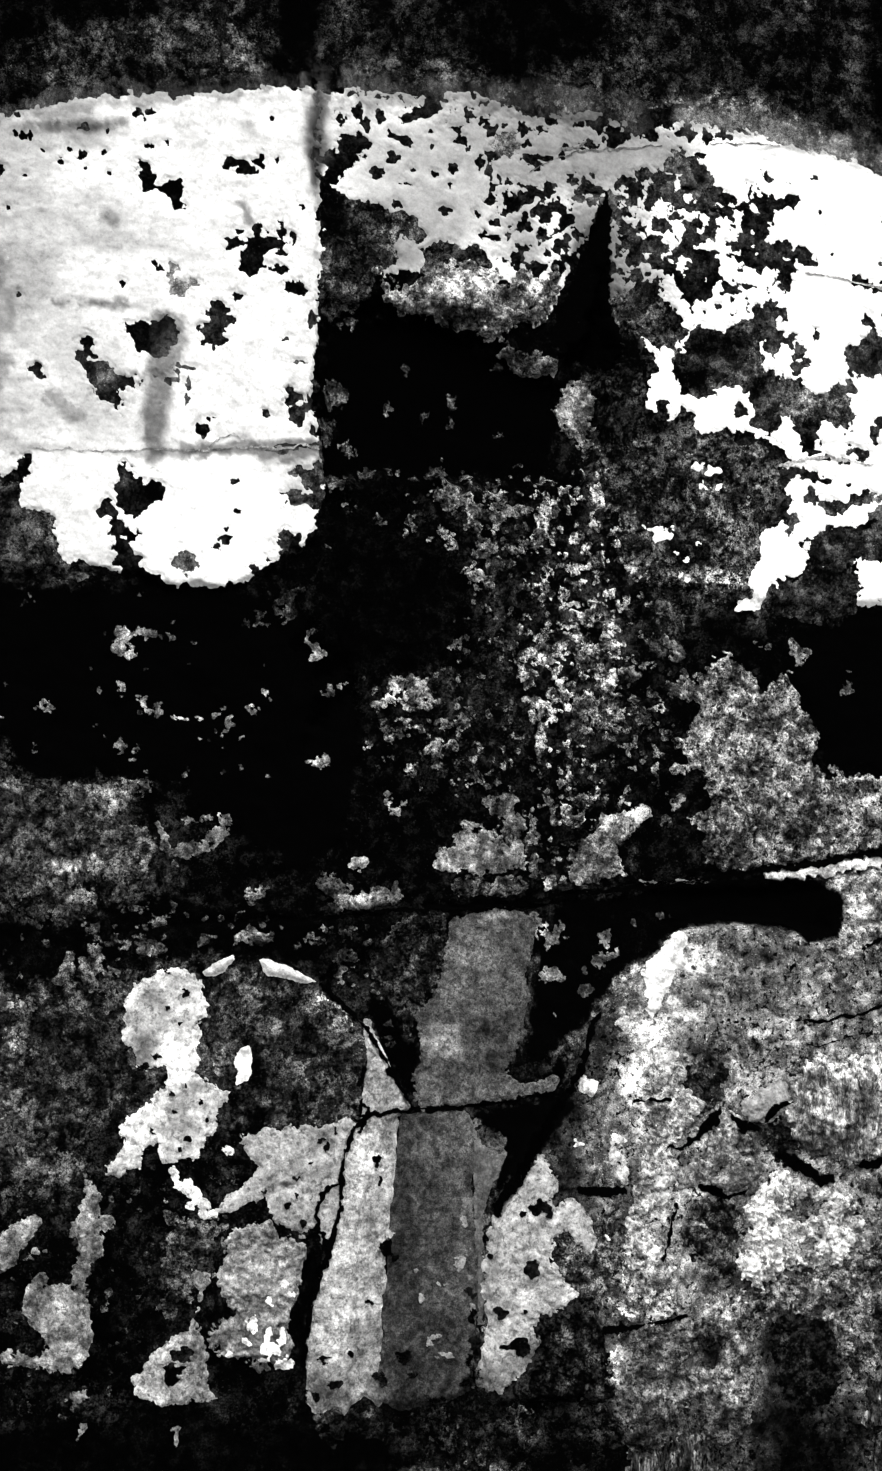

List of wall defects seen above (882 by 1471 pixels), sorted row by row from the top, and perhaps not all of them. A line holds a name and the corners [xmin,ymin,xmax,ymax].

crack [33,432,319,453]
peeling [0,84,882,891]
spalling [0,724,449,1441]
peeling [578,1075,598,1097]
peeling [472,1118,507,1155]
crack [300,982,602,1367]
crack [577,1185,627,1198]
crack [602,1314,688,1335]